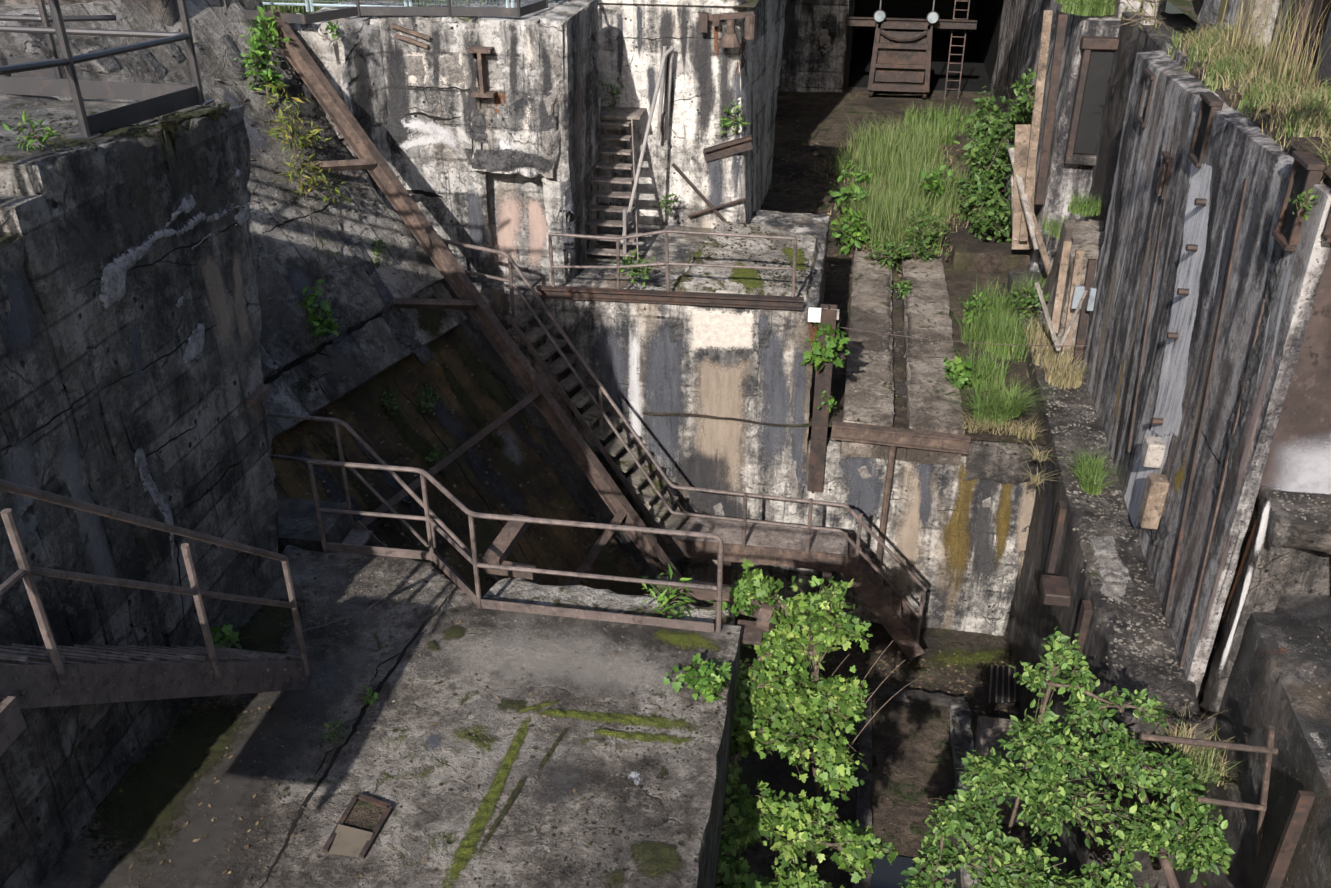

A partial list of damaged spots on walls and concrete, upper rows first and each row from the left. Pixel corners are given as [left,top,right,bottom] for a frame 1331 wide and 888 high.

water stain [99,194,250,363]
rust [494,92,505,113]
water stain [617,5,748,218]
water stain [1104,109,1162,313]
water stain [1113,199,1175,464]
water stain [1193,165,1273,408]
water stain [839,457,883,525]
water stain [896,462,933,572]
water stain [943,456,1056,596]
water stain [1075,568,1087,627]
water stain [1198,263,1292,645]
crack [259,586,458,888]